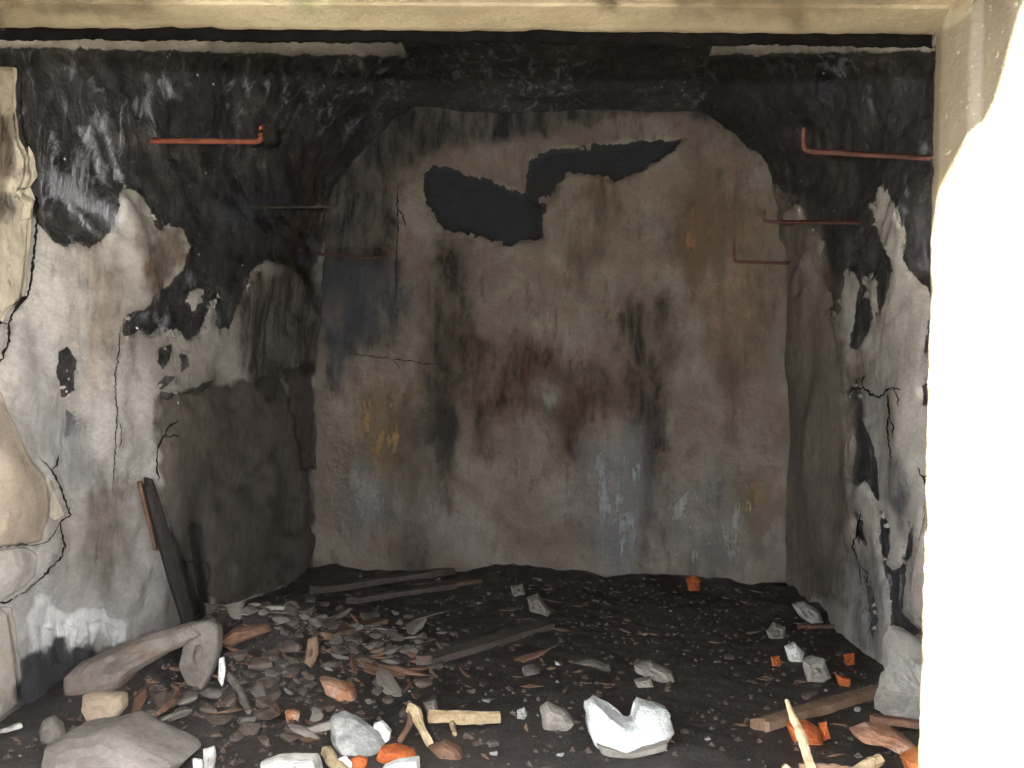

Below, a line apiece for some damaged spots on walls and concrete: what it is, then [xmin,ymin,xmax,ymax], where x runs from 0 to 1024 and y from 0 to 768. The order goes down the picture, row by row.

crack [0,65,39,362]
spalling [0,46,415,404]
spalling [423,135,688,249]
spalling [56,347,79,437]
leakage [425,240,471,465]
leakage [594,296,669,573]
crack [840,375,901,459]